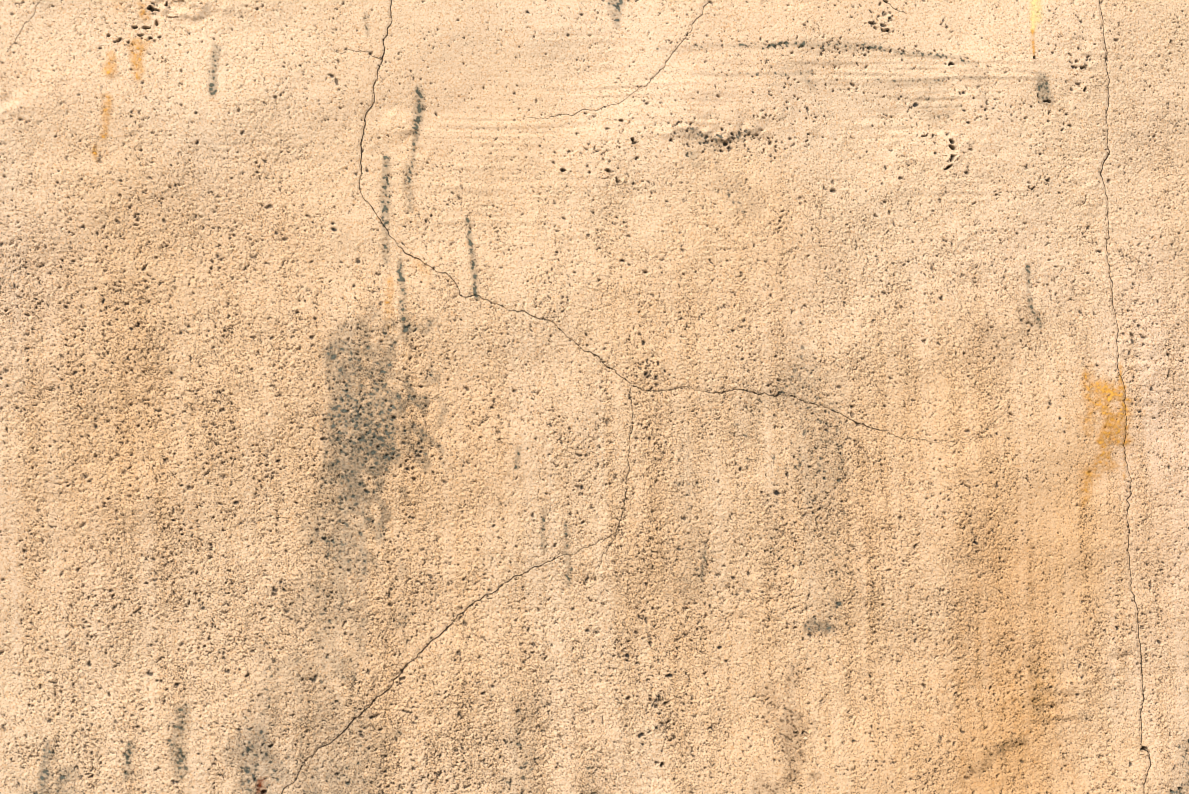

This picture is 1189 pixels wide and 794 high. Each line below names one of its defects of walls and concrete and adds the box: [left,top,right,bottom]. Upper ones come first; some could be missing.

damp [381,156,391,227]
damp [407,87,423,183]
damp [312,264,427,574]
crack [281,5,1010,794]
rust [1084,371,1129,492]
crack [1086,0,1151,787]